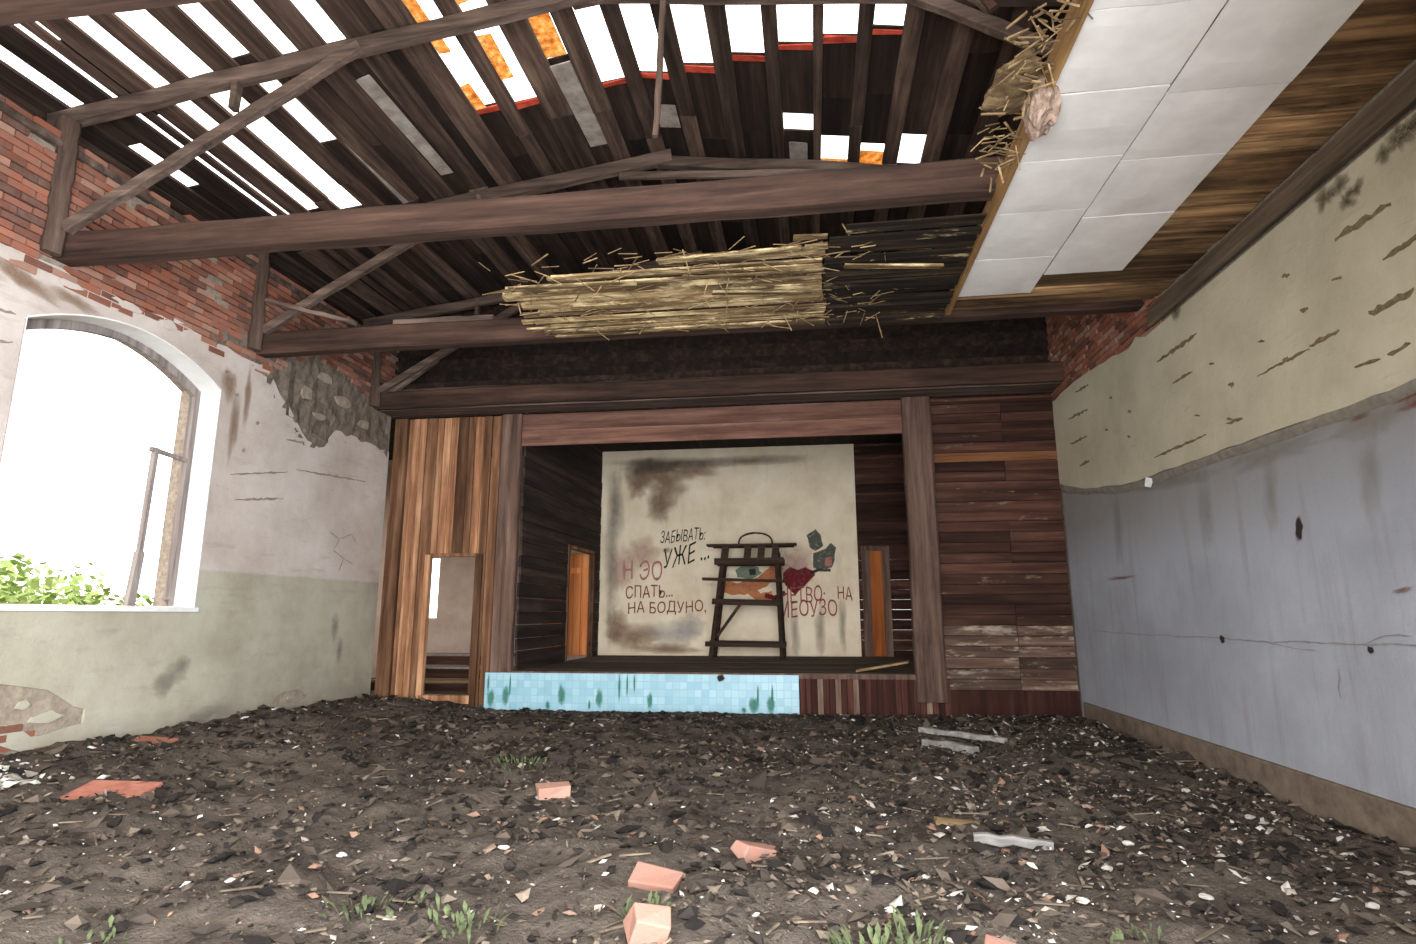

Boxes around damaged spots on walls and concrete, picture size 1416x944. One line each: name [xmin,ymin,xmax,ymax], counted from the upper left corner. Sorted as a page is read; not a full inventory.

flaking render [0,94,399,457]
damp [633,466,703,515]
spalling [0,684,83,757]